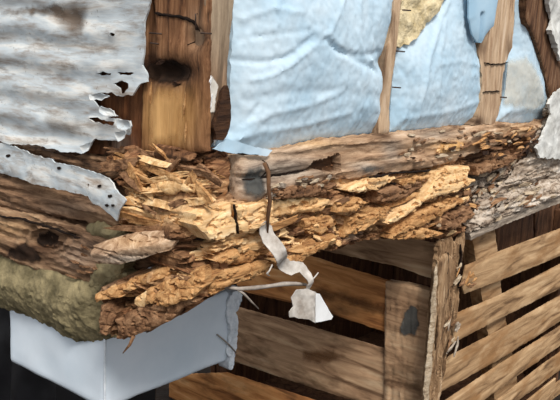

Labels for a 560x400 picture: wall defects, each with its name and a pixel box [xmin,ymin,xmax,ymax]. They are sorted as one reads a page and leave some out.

peeling [89,93,131,142]
crack [232,204,242,249]
crack [446,244,463,302]
leakage [400,305,419,335]